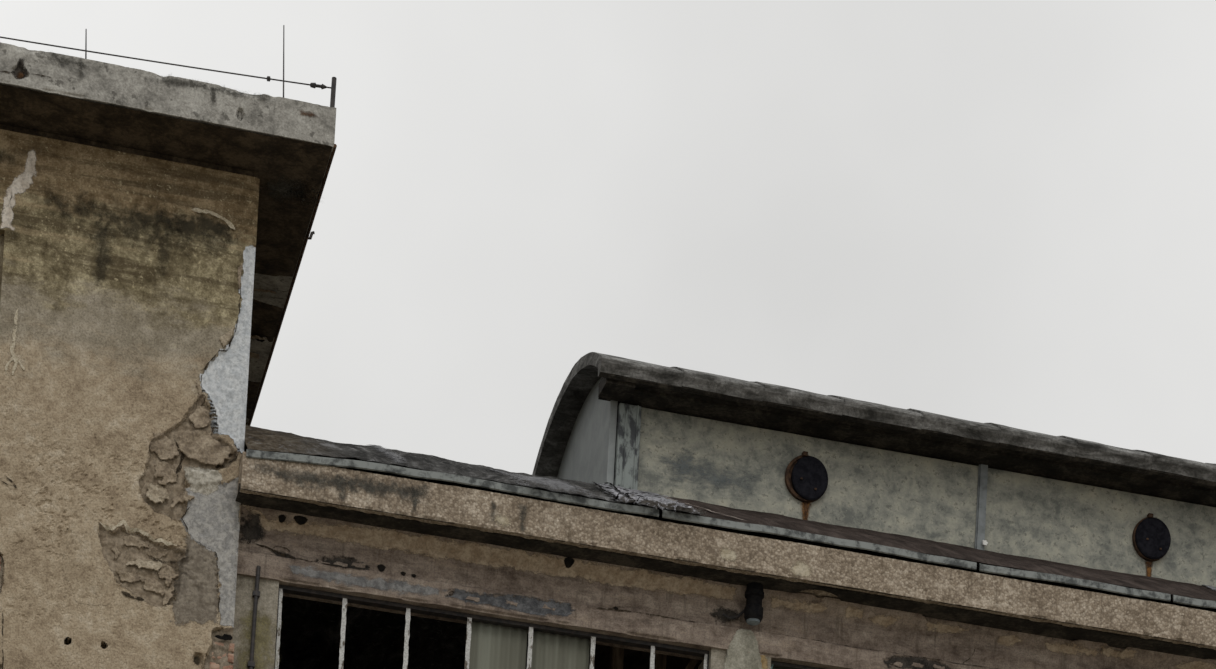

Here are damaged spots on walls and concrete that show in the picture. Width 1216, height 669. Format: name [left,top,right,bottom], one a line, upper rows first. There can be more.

crack [1,150,36,231]
damp [47,195,231,280]
flaking render [191,208,235,237]
peeling [98,246,743,669]
corrosion [802,502,811,520]
peeling [884,655,951,669]